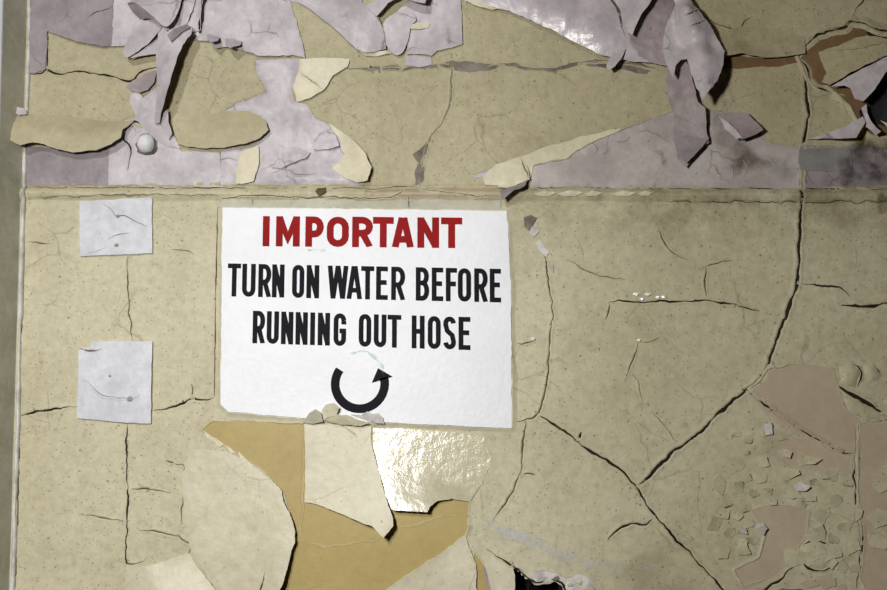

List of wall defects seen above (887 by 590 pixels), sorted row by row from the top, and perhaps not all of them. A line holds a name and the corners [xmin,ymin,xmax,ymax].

peeling [10,0,887,210]
crack [851,0,868,17]
crack [15,185,369,590]
peeling [524,215,549,257]
crack [492,69,887,590]
peeling [125,403,601,590]